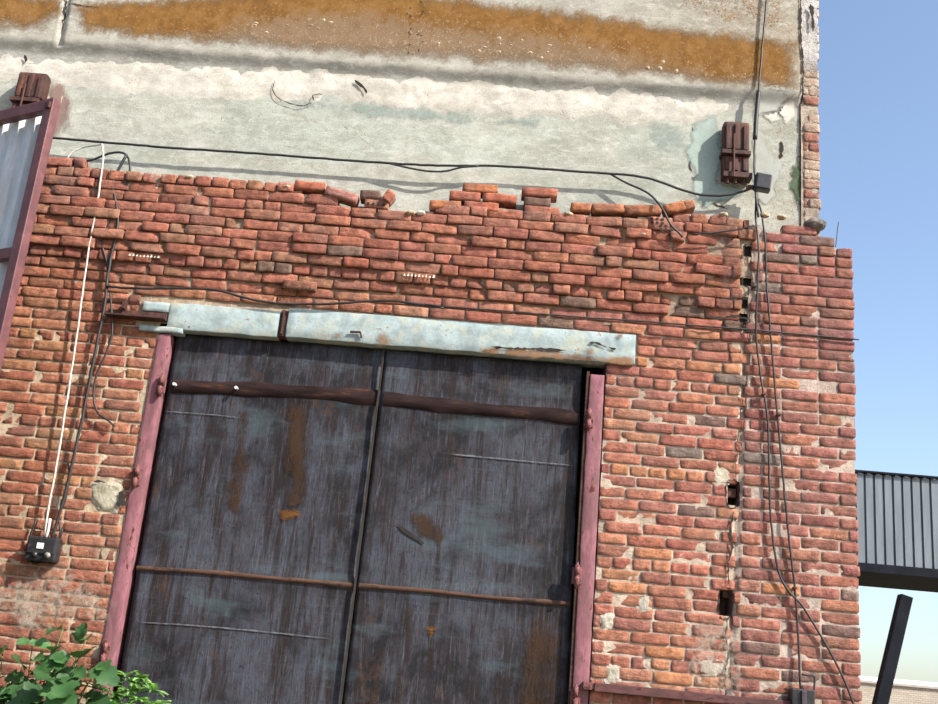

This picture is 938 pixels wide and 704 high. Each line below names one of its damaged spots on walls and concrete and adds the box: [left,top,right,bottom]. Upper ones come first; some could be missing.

water stain [0,0,61,30]
crack [62,0,96,30]
water stain [77,0,798,91]
crack [799,0,815,146]
spalling [752,85,796,204]
corrosion [485,348,634,365]
corrosion [280,403,309,520]
spalling [90,480,127,514]
corrosion [412,513,445,544]